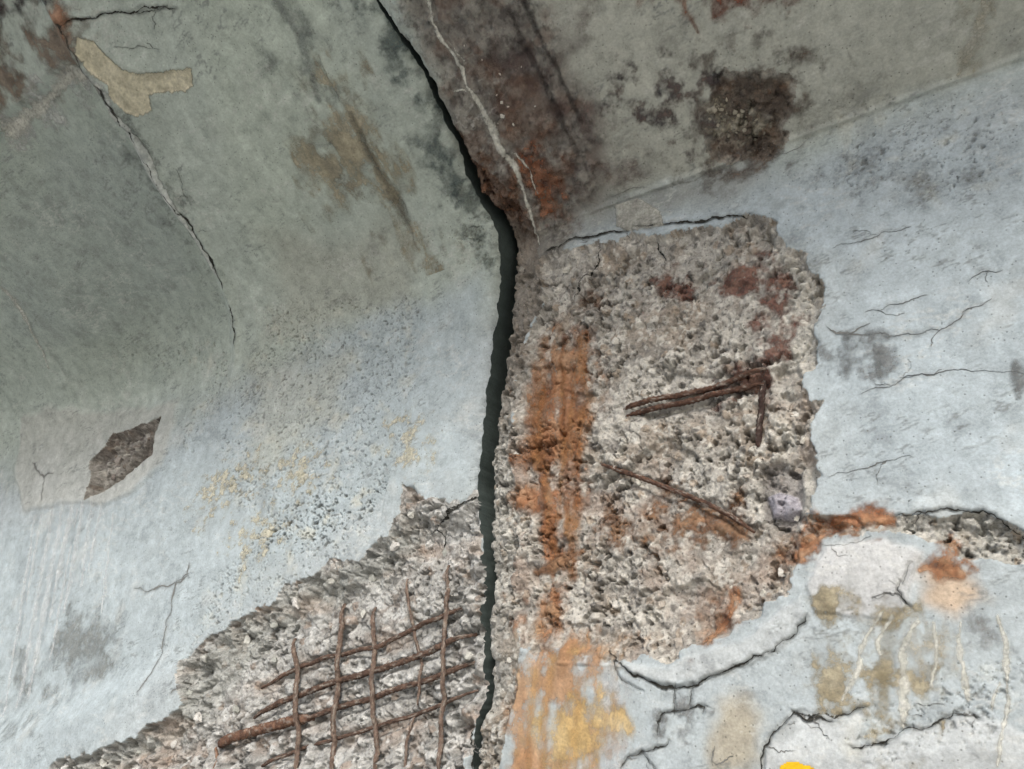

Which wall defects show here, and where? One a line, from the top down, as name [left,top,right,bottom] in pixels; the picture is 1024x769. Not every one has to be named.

peeling [75,37,220,282]
leakage [426,0,540,245]
leakage [552,51,811,180]
crack [546,213,751,298]
corrosion [714,251,799,401]
spalling [48,157,1024,769]
corrosion [504,326,634,769]
corrosion [643,479,750,551]
corrosion [778,503,896,564]
crack [609,617,806,769]
crack [760,707,864,769]
leakage [812,603,970,738]